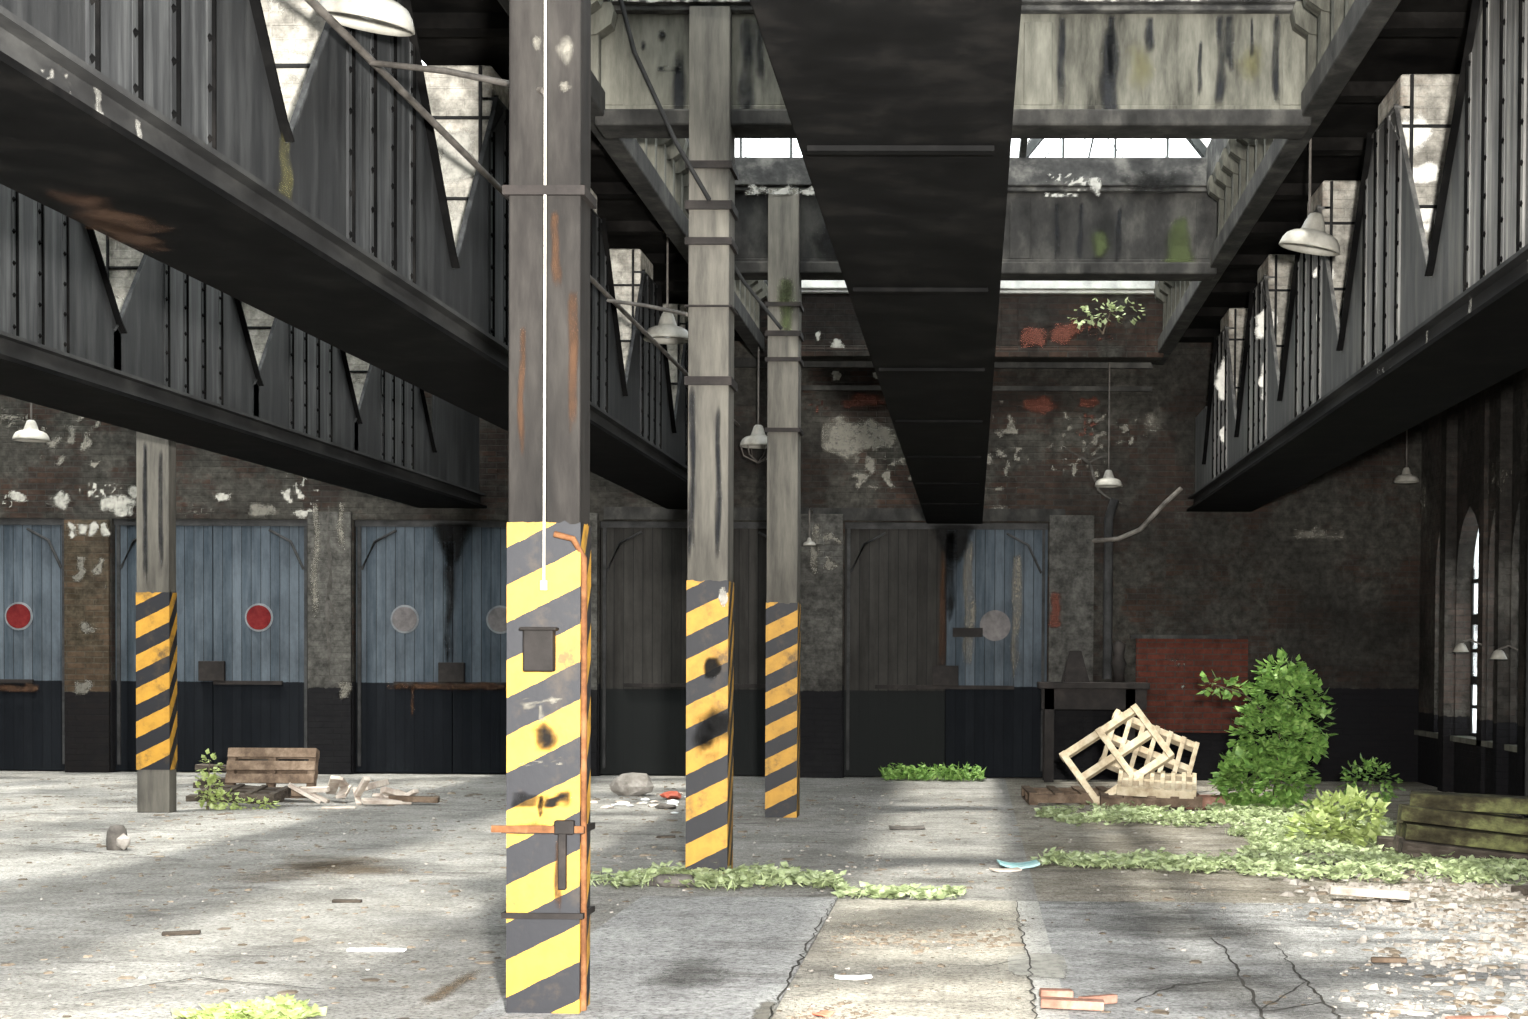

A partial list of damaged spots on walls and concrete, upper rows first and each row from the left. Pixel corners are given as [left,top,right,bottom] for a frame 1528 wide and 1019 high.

leakage [658,56,685,109]
leakage [739,21,764,109]
leakage [1057,20,1065,99]
leakage [1085,0,1119,109]
leakage [1146,19,1154,48]
leakage [1198,16,1233,101]
peeling [822,416,912,489]
peeling [987,401,1029,509]
peeling [1048,412,1154,477]
peeling [250,478,318,517]
crack [1135,938,1341,1019]